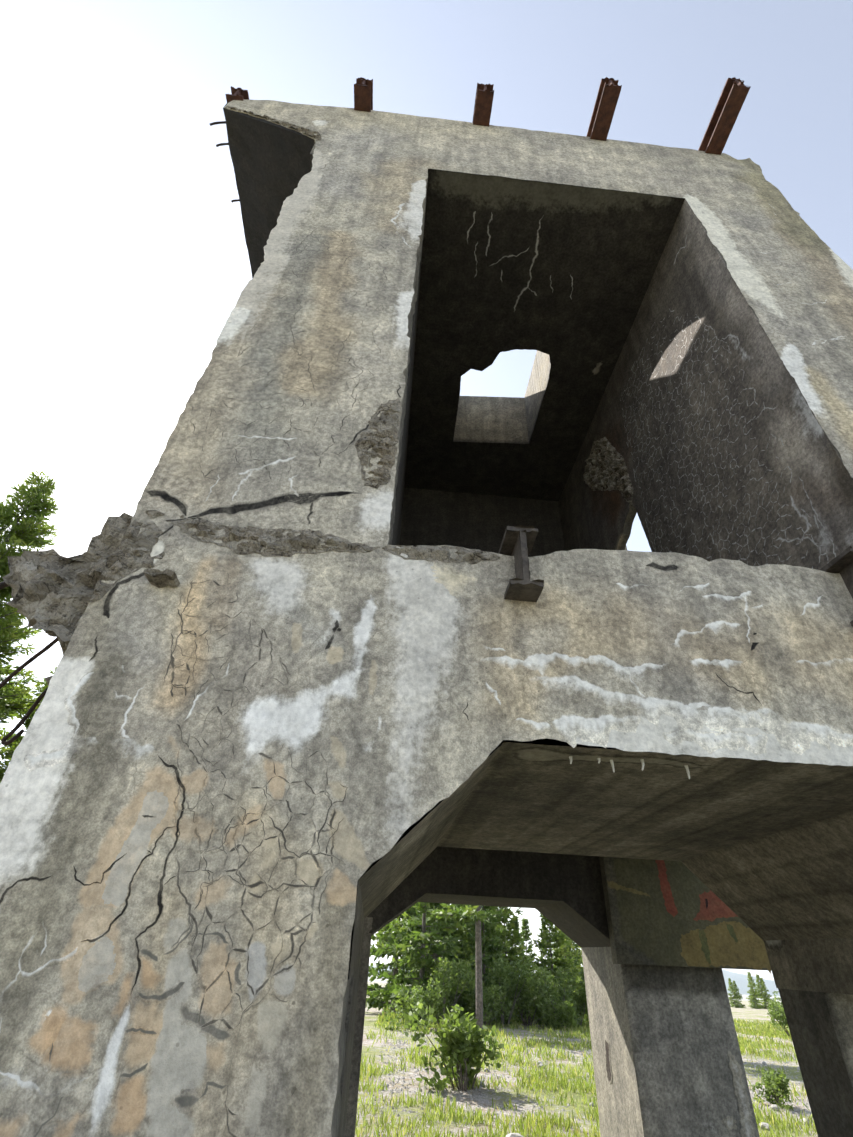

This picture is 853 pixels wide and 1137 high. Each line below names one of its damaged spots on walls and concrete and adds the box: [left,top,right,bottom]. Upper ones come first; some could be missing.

crack [144,223,402,538]
spalling [355,398,401,489]
spalling [583,437,633,506]
spalling [1,687,48,745]
damp [226,484,488,862]
damp [512,708,853,770]
crack [0,568,349,1137]